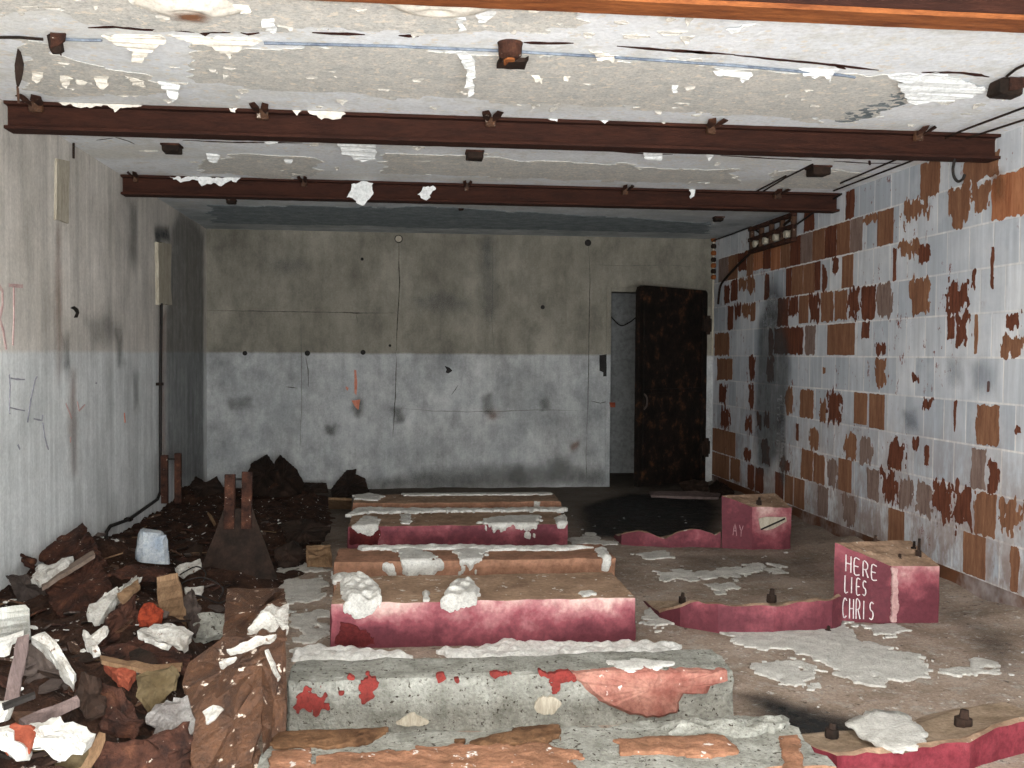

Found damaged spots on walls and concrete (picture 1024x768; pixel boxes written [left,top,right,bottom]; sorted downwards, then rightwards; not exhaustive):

crack [523,39,574,47]
spalling [0,0,1004,124]
crack [617,46,879,71]
crack [921,70,989,78]
peeling [712,149,1024,593]
spalling [534,695,562,715]
spalling [396,712,429,727]